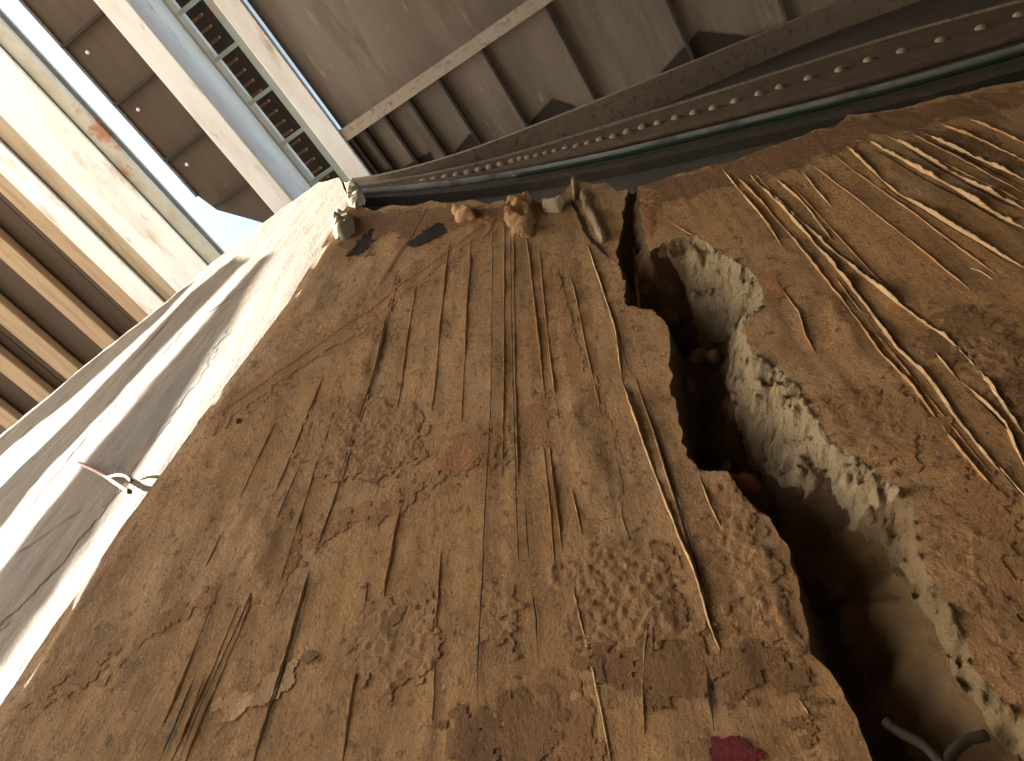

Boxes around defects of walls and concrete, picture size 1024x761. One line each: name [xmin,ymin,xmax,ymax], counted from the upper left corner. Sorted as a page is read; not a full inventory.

crack [857,142,1024,270]
crack [756,181,1024,496]
crack [570,187,915,761]
spalling [542,475,808,658]
leakage [431,625,833,761]